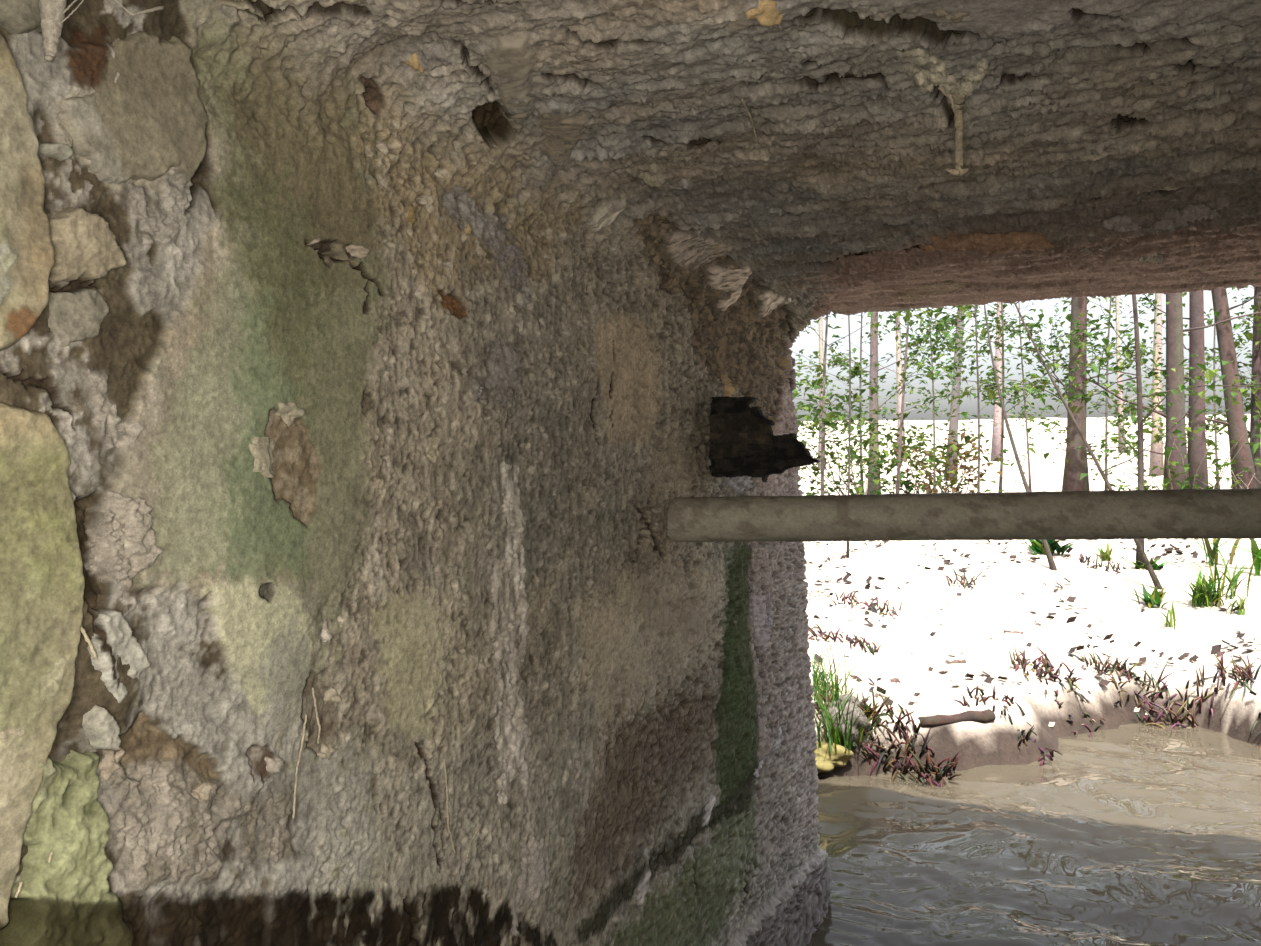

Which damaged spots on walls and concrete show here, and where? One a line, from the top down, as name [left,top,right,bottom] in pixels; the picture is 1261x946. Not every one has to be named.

spalling [472,101,514,141]
crack [349,264,383,314]
spalling [249,401,320,526]
damp [751,591,775,651]
crack [415,744,442,865]
damp [0,836,556,946]